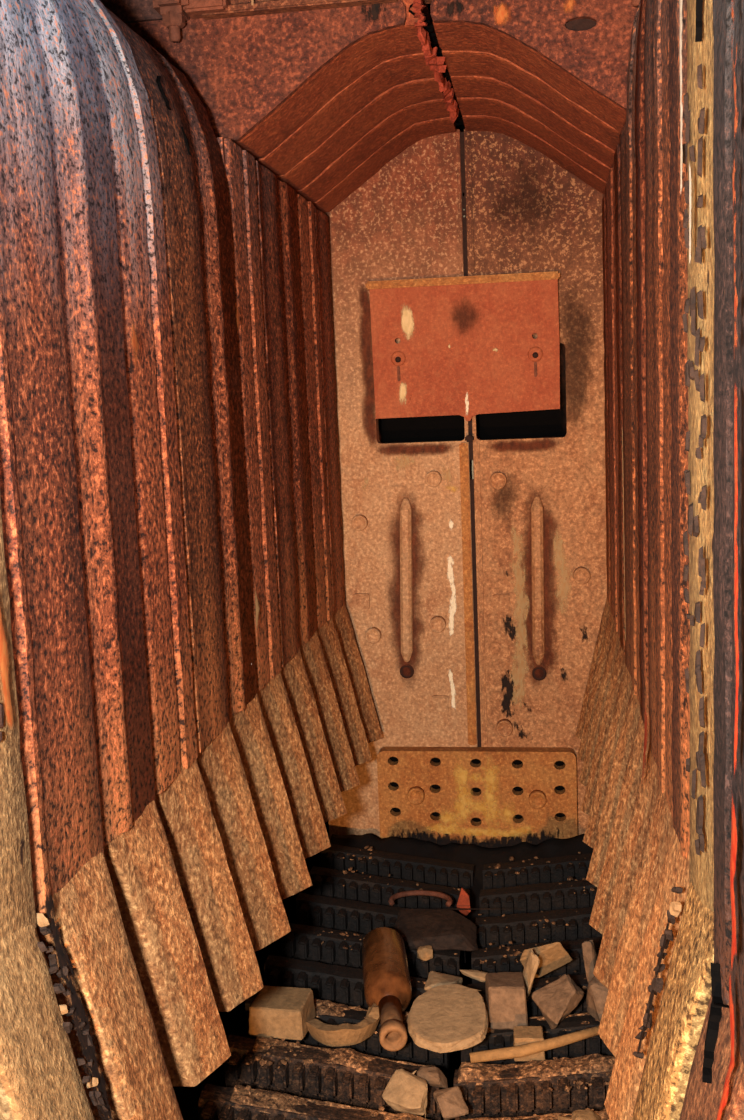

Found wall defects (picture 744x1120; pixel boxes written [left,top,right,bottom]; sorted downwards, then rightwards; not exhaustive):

crack [409,4,464,126]
crack [695,0,703,42]